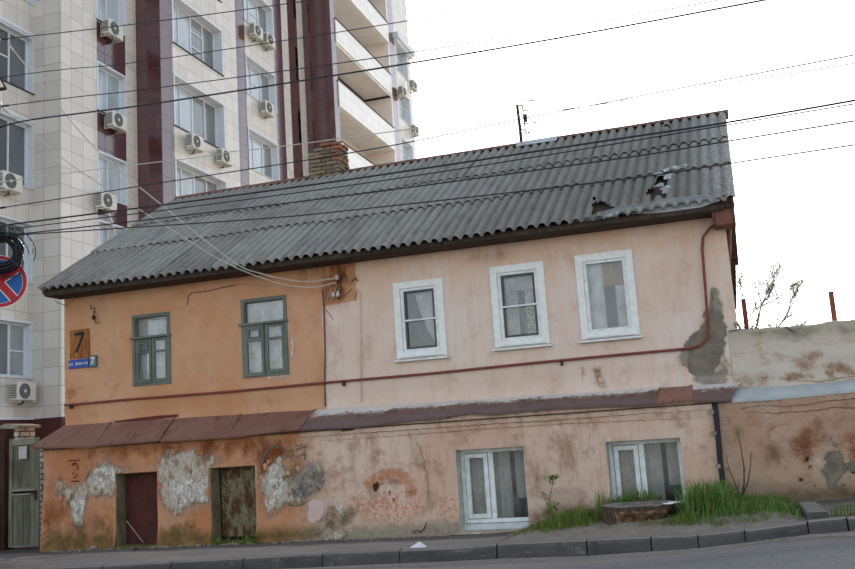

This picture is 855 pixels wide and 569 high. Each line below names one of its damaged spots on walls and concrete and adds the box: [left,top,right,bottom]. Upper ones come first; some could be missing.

crack [742,376,855,444]
flaking render [54,460,128,526]
flaking render [156,448,219,517]
flaking render [256,454,324,515]